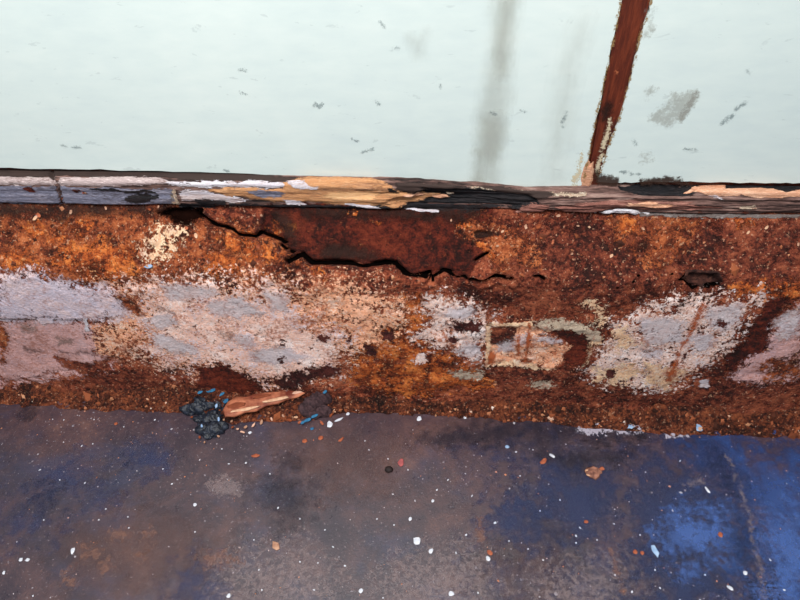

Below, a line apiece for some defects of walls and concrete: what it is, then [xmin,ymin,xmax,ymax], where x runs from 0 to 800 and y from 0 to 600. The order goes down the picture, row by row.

rust [0,323,10,364]
rust [7,354,206,393]
rust [0,197,328,316]
crack [201,213,513,282]
peeling [0,192,774,421]
rust [346,205,800,416]